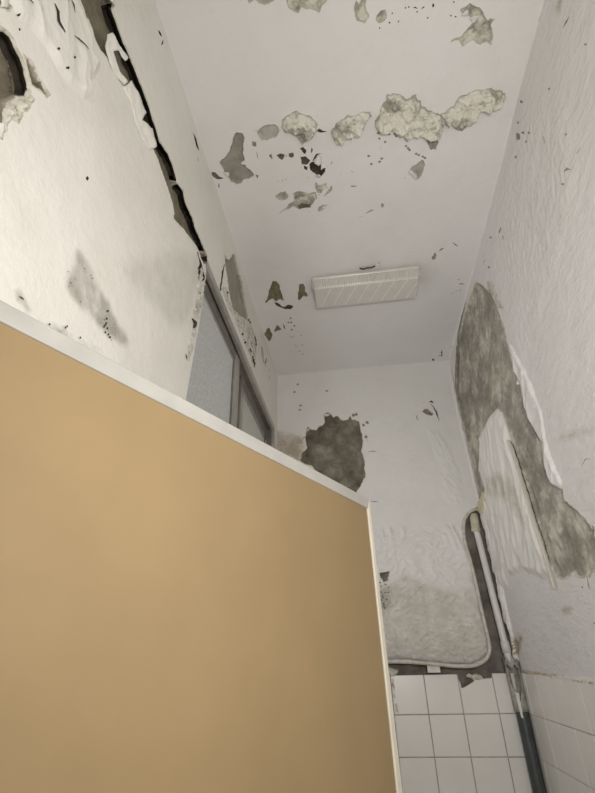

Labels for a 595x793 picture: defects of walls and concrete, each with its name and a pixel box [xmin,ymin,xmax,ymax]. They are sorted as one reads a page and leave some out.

flaking render [0,0,13,12]
flaking render [285,0,328,14]
flaking render [450,1,496,47]
flaking render [0,25,51,139]
crack [55,0,225,294]
flaking render [219,124,280,185]
flaking render [269,145,333,214]
flaking render [300,412,376,493]